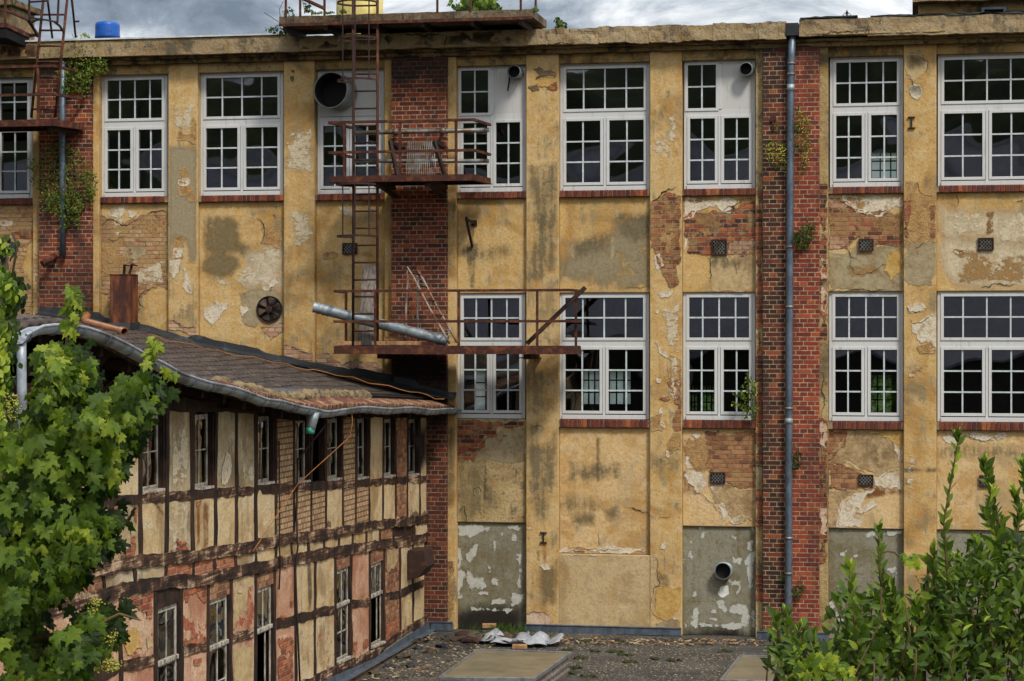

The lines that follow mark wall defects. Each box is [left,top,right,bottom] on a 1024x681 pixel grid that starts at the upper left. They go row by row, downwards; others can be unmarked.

peeling [528,67,558,92]
flaking render [101,206,192,319]
flaking render [178,167,197,202]
water stain [169,147,248,276]
flaking render [168,211,385,373]
water stain [530,165,648,287]
peeling [820,181,1024,339]
water stain [567,499,593,523]
water stain [572,439,609,477]
flaking render [559,191,763,630]
peeling [448,524,551,624]